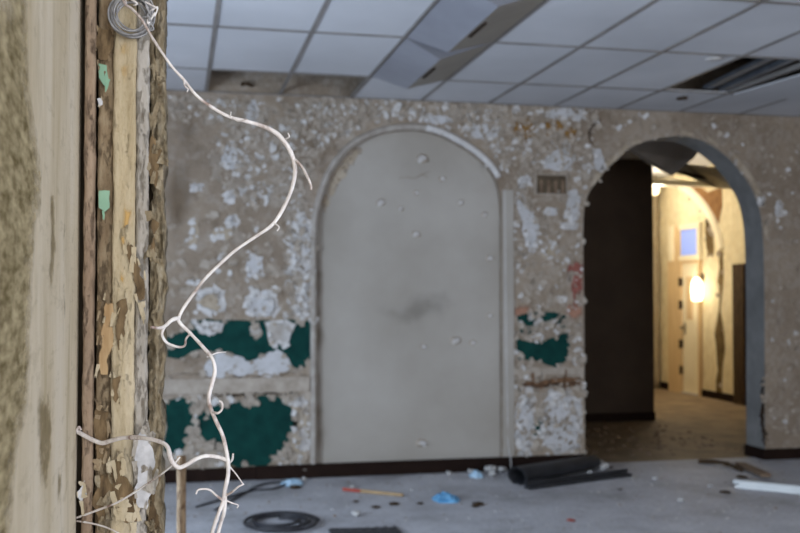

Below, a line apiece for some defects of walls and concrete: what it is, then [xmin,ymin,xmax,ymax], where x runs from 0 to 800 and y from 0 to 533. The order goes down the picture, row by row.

peeling [95,25,115,108]
peeling [611,112,800,251]
peeling [76,56,642,533]